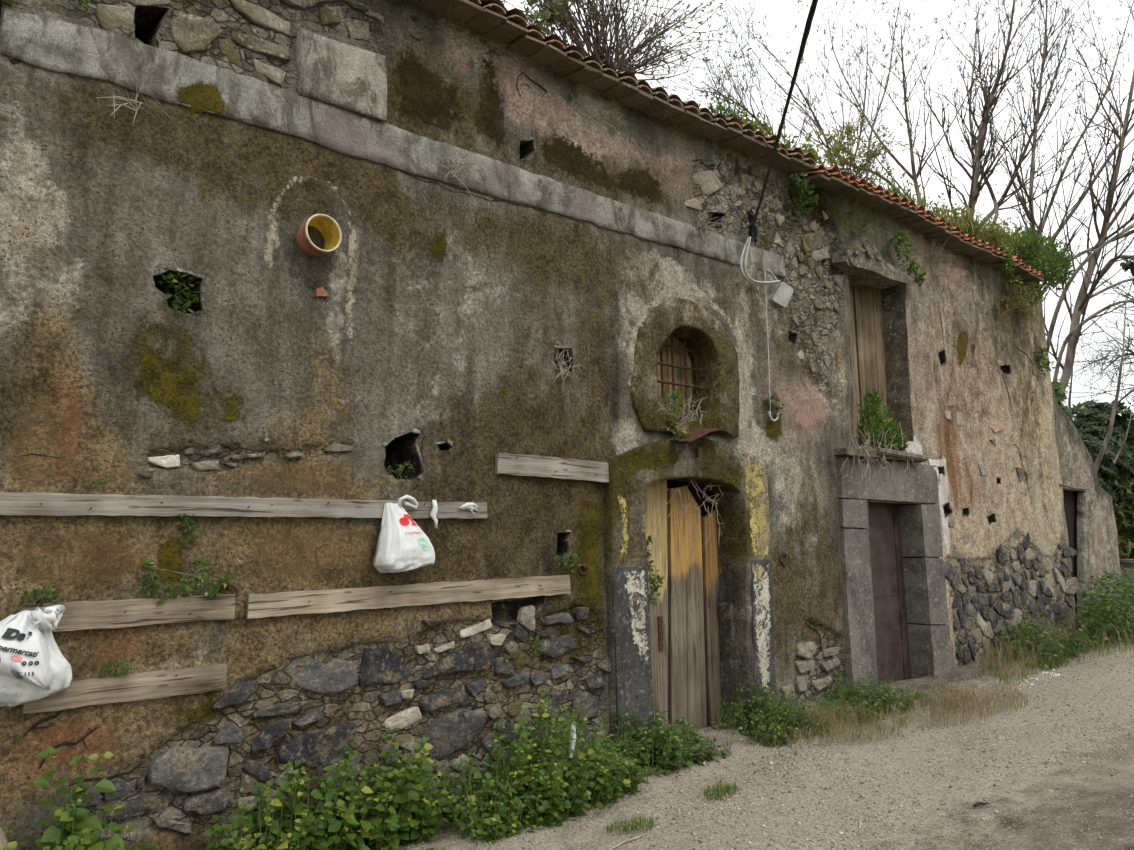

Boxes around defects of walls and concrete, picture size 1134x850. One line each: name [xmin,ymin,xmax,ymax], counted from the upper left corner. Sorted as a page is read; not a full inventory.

spalling [130,5,172,47]
spalling [708,212,726,234]
spalling [153,268,206,319]
spalling [788,330,799,344]
spalling [381,427,426,481]
spalling [436,438,453,451]
rust [668,428,733,442]
rust [945,419,973,509]
peeling [745,464,771,695]
peeling [624,570,649,661]